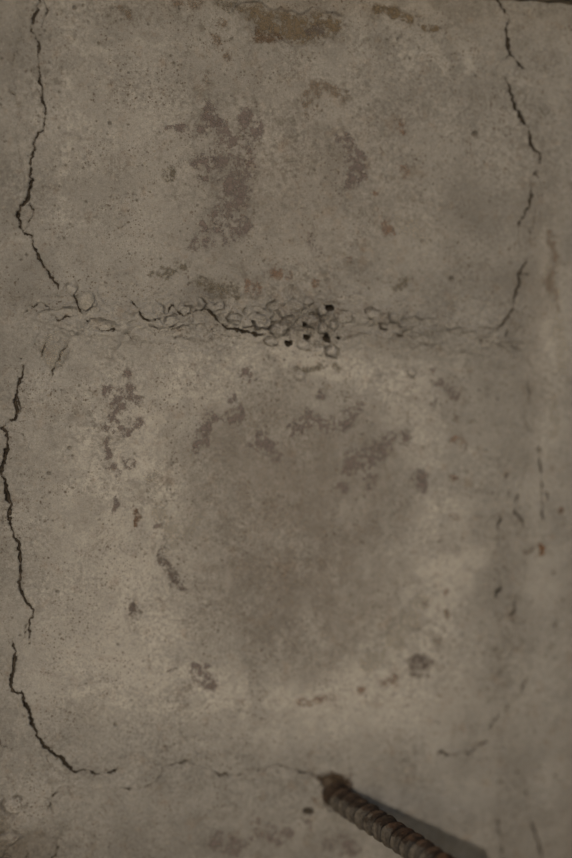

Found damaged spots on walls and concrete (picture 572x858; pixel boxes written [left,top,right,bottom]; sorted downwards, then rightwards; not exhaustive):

crack [16,0,271,338]
crack [496,0,541,233]
crack [463,262,528,349]
crack [0,343,187,790]
crack [497,459,548,530]
rust [317,771,353,790]